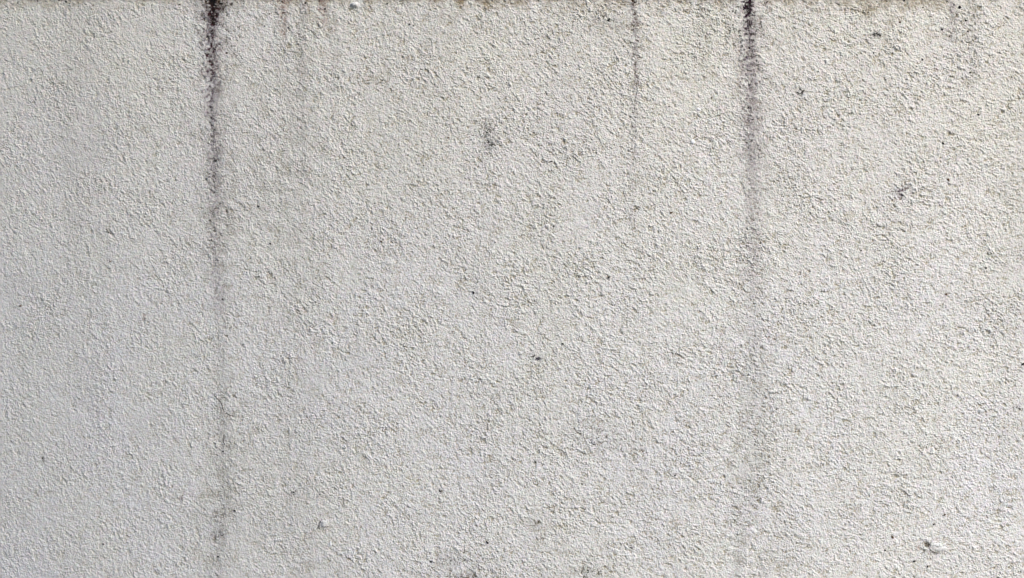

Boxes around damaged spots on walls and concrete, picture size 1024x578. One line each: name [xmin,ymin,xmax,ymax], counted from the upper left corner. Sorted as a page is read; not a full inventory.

water stain [196,0,240,193]
water stain [729,0,769,89]